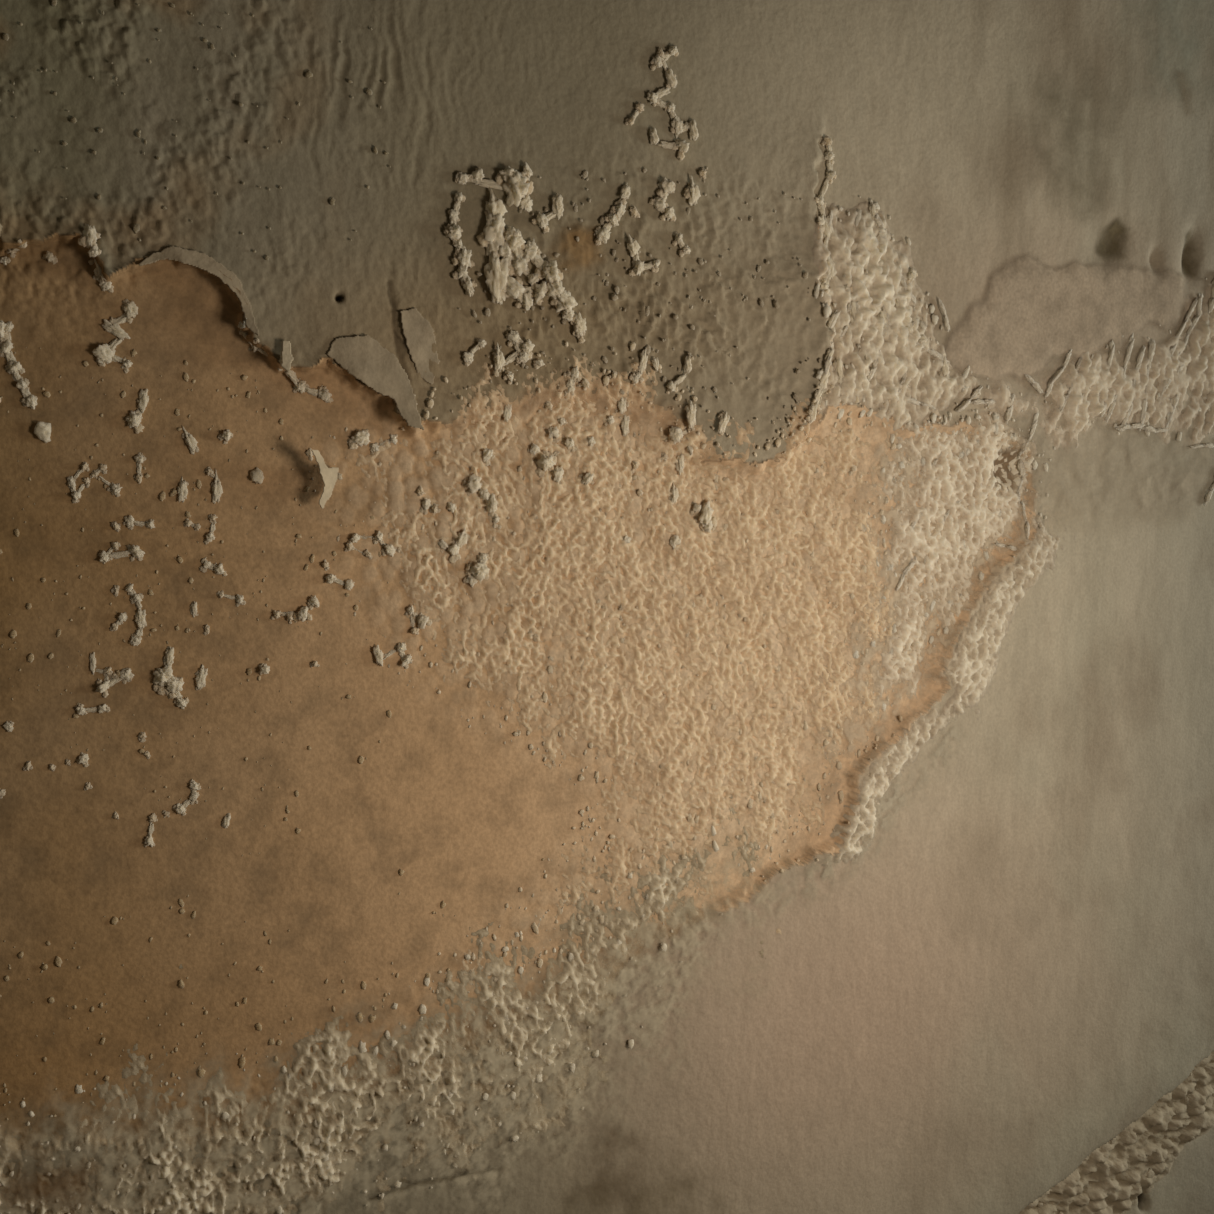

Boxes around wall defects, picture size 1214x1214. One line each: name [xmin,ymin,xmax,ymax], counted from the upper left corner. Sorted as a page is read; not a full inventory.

leakage [0,239,27,265]
spalling [1098,220,1125,257]
spalling [1182,233,1193,275]
leakage [78,224,161,434]
leakage [238,321,333,403]
leakage [164,408,199,455]
leakage [209,373,284,457]
leakage [65,443,150,510]
leakage [98,459,322,710]
leakage [49,642,134,772]
spalling [0,224,1037,1126]
leakage [144,776,224,847]